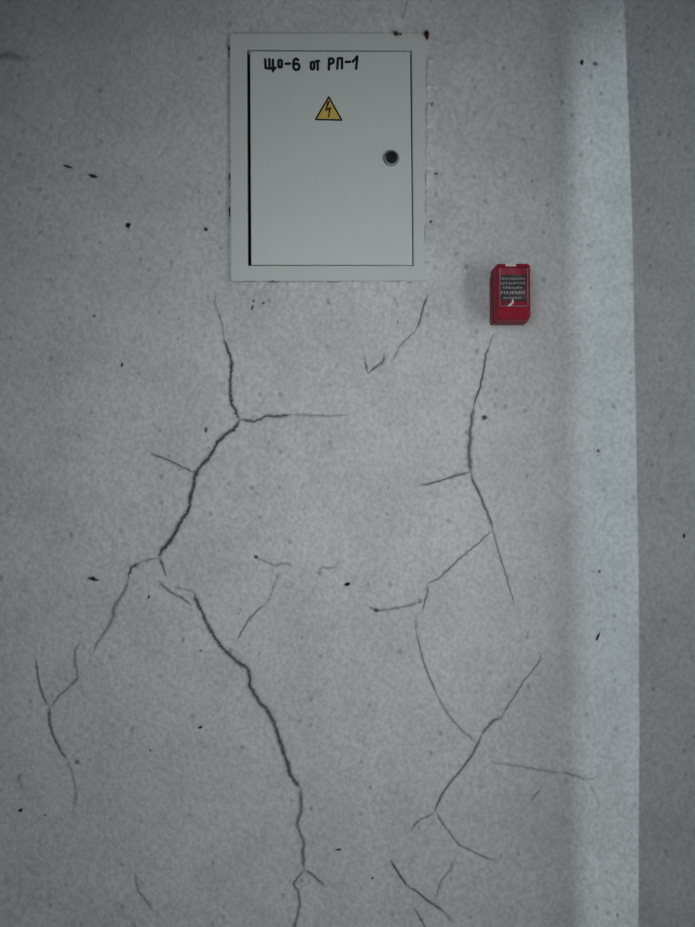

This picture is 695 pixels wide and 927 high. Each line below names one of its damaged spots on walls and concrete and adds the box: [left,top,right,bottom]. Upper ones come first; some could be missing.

crack [159,341,287,572]
crack [424,350,492,582]
crack [36,662,63,754]
crack [194,596,320,881]
crack [436,740,480,807]